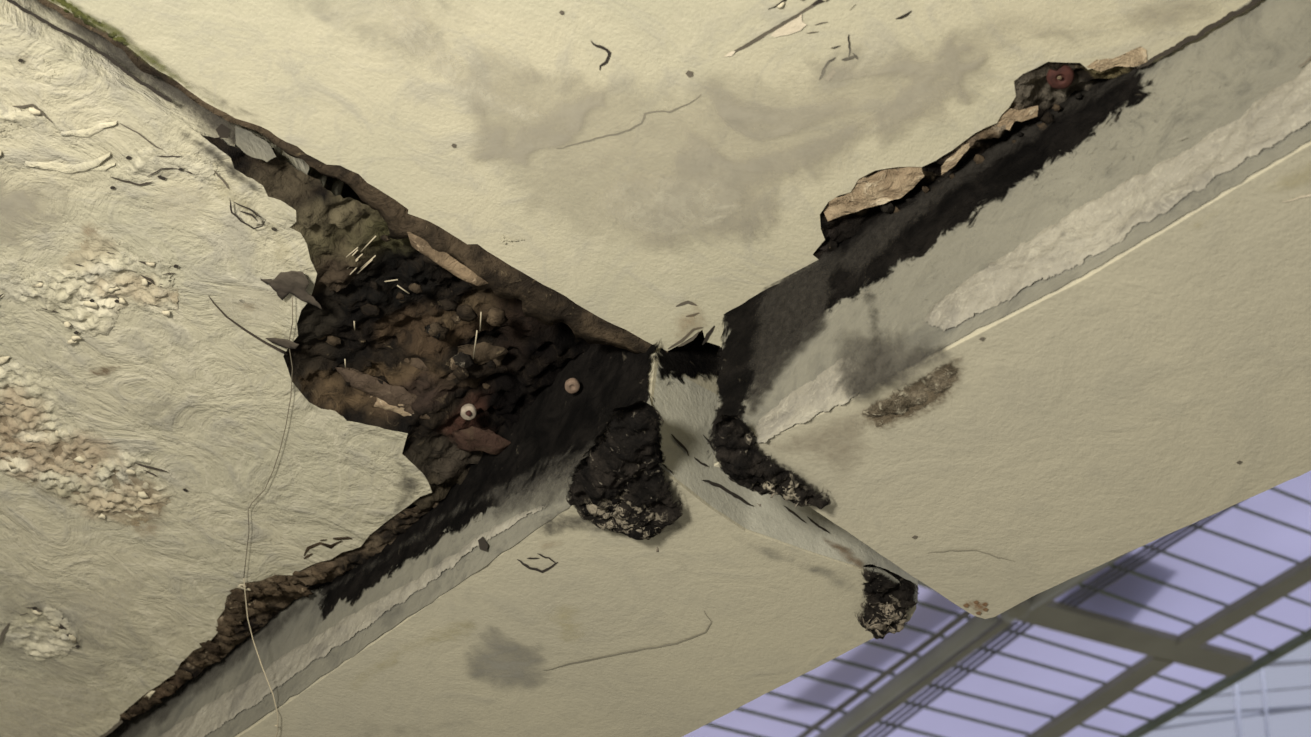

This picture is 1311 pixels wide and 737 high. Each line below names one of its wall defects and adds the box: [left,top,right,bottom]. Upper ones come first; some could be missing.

water stain [653,38,984,241]
spalling [813,47,1153,259]
peeling [0,228,181,345]
water stain [1,439,87,495]
peeling [0,355,188,527]
spalling [104,123,592,737]
water stain [668,327,703,349]
peeling [754,356,876,443]
water stain [841,337,925,397]
water stain [262,615,285,636]
water stain [855,564,919,639]
water stain [105,638,263,737]